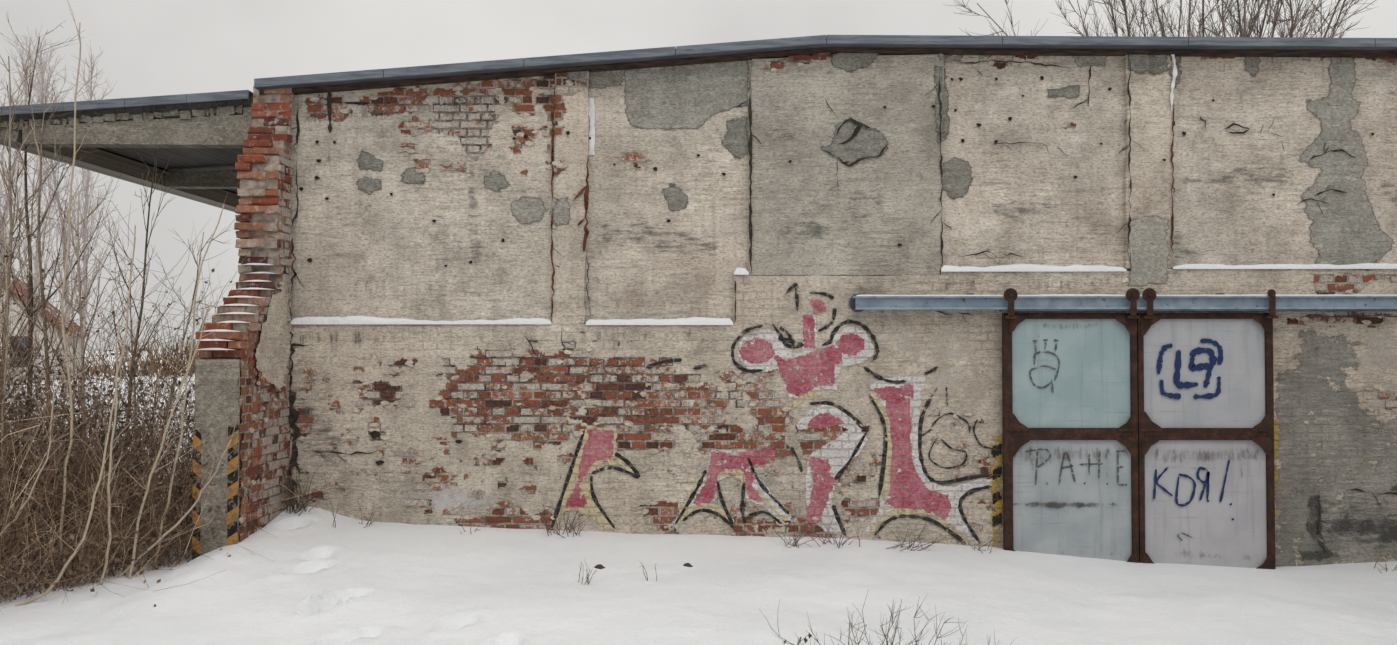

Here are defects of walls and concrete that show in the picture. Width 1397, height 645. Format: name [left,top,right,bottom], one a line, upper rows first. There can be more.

spalling [305,72,590,176]
crack [288,92,380,501]
spalling [289,382,341,444]
spalling [352,358,418,441]
spalling [401,332,870,534]
flaking render [1274,272,1397,567]
spalling [302,488,331,503]